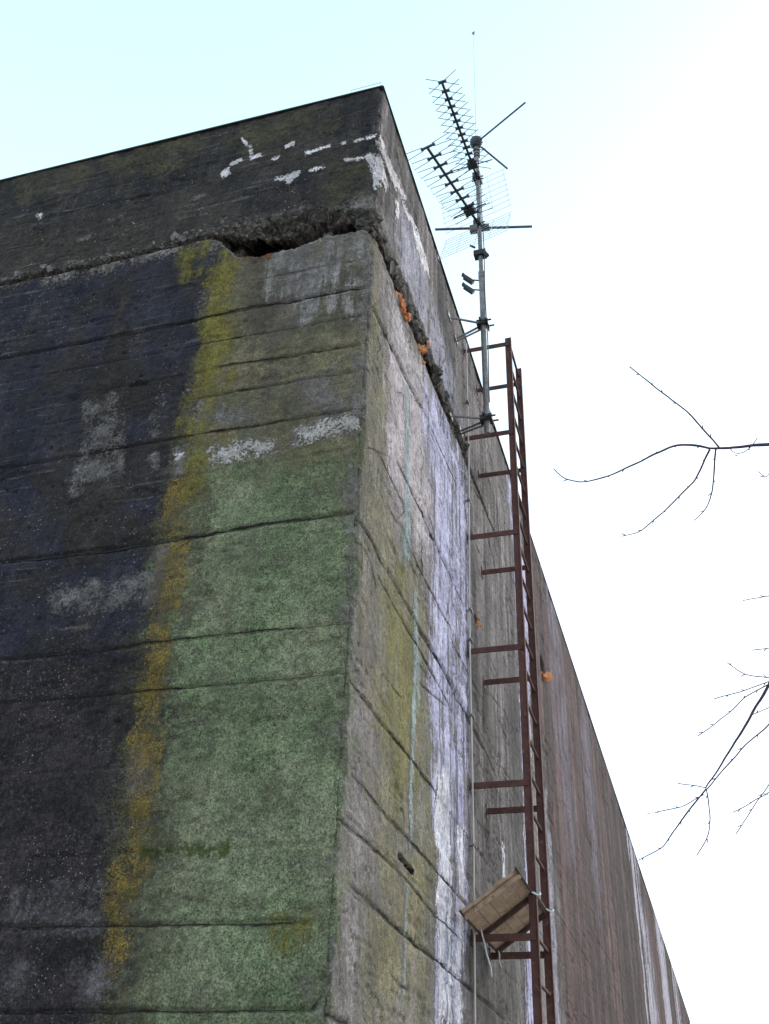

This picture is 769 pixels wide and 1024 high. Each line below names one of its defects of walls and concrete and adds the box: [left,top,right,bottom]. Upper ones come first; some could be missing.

spalling [221,205,377,258]
spalling [395,291,412,322]
spalling [417,340,429,364]
damp [220,134,470,1024]
damp [0,240,231,1024]